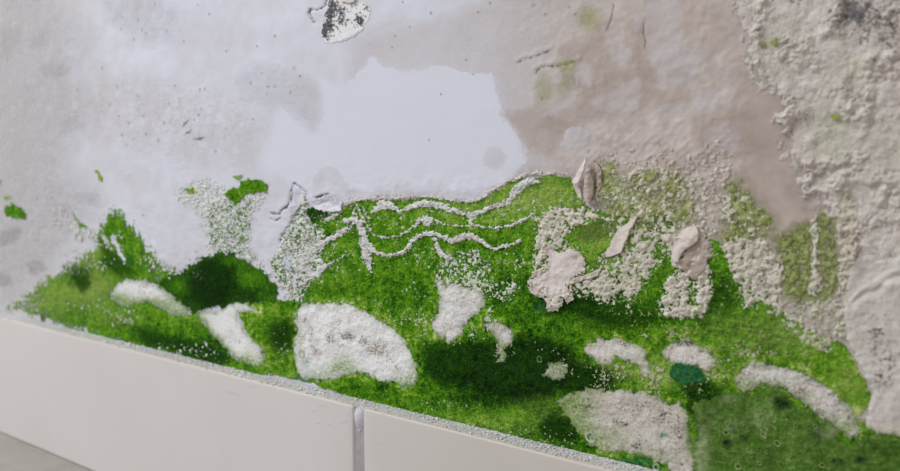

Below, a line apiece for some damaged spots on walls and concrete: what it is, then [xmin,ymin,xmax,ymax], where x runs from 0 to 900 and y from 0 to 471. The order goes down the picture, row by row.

peeling [320,0,371,43]
water stain [48,205,123,271]
peeling [288,184,342,219]
water stain [128,0,878,419]
flaking render [527,0,900,471]